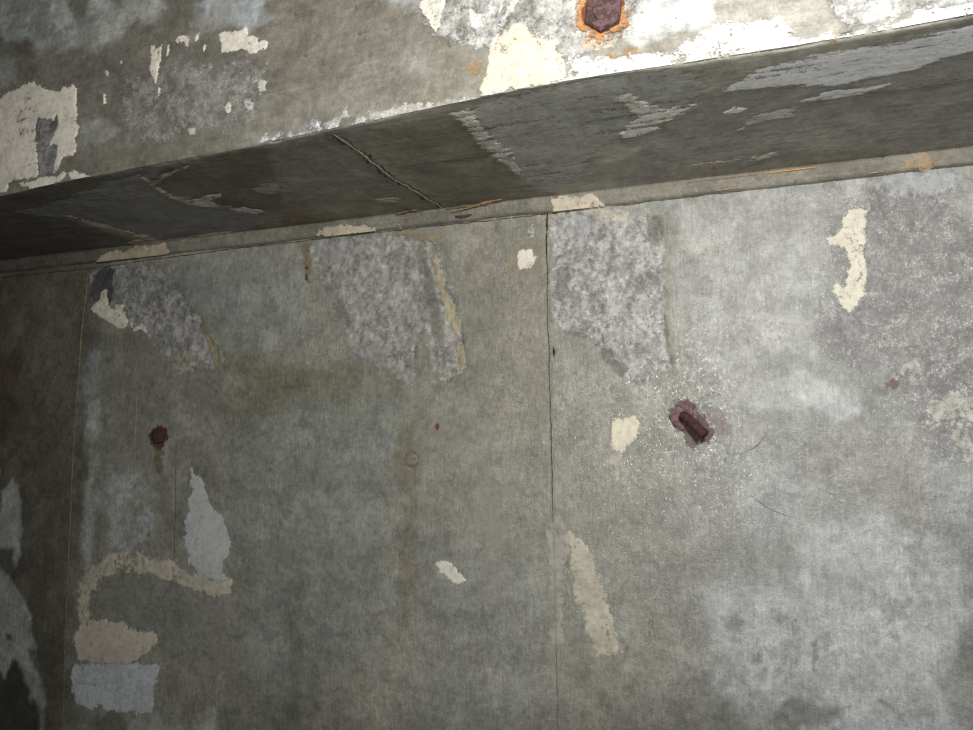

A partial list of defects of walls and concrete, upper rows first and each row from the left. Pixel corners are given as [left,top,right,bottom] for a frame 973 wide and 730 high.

spalling [419,0,638,59]
corrosion [573,0,632,43]
spalling [828,0,973,31]
peeling [20,170,89,189]
crack [332,133,488,208]
peeling [517,249,537,270]
spalling [305,233,467,386]
spalling [548,206,674,392]
corrosion [668,398,714,450]